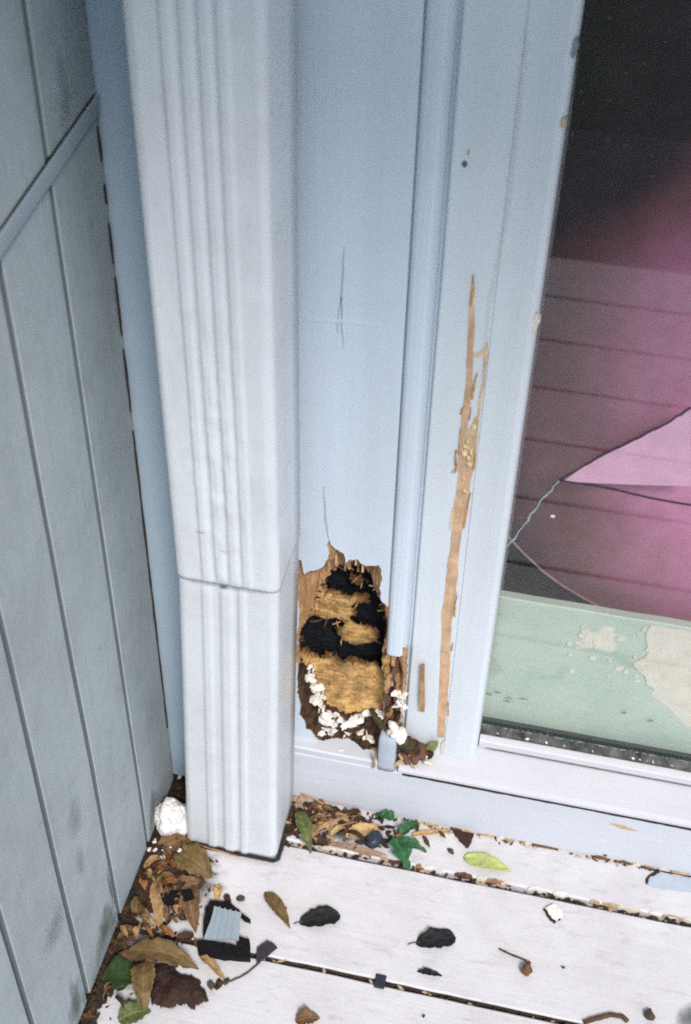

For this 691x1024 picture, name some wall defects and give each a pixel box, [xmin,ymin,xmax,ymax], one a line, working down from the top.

peeling [566,625,691,727]
peeling [305,631,408,751]
spalling [301,841,342,854]
spalling [359,852,402,865]
peeling [450,827,558,851]
spalling [416,864,509,887]
peeling [592,854,691,893]
peeling [528,886,571,924]
spalling [589,899,691,923]